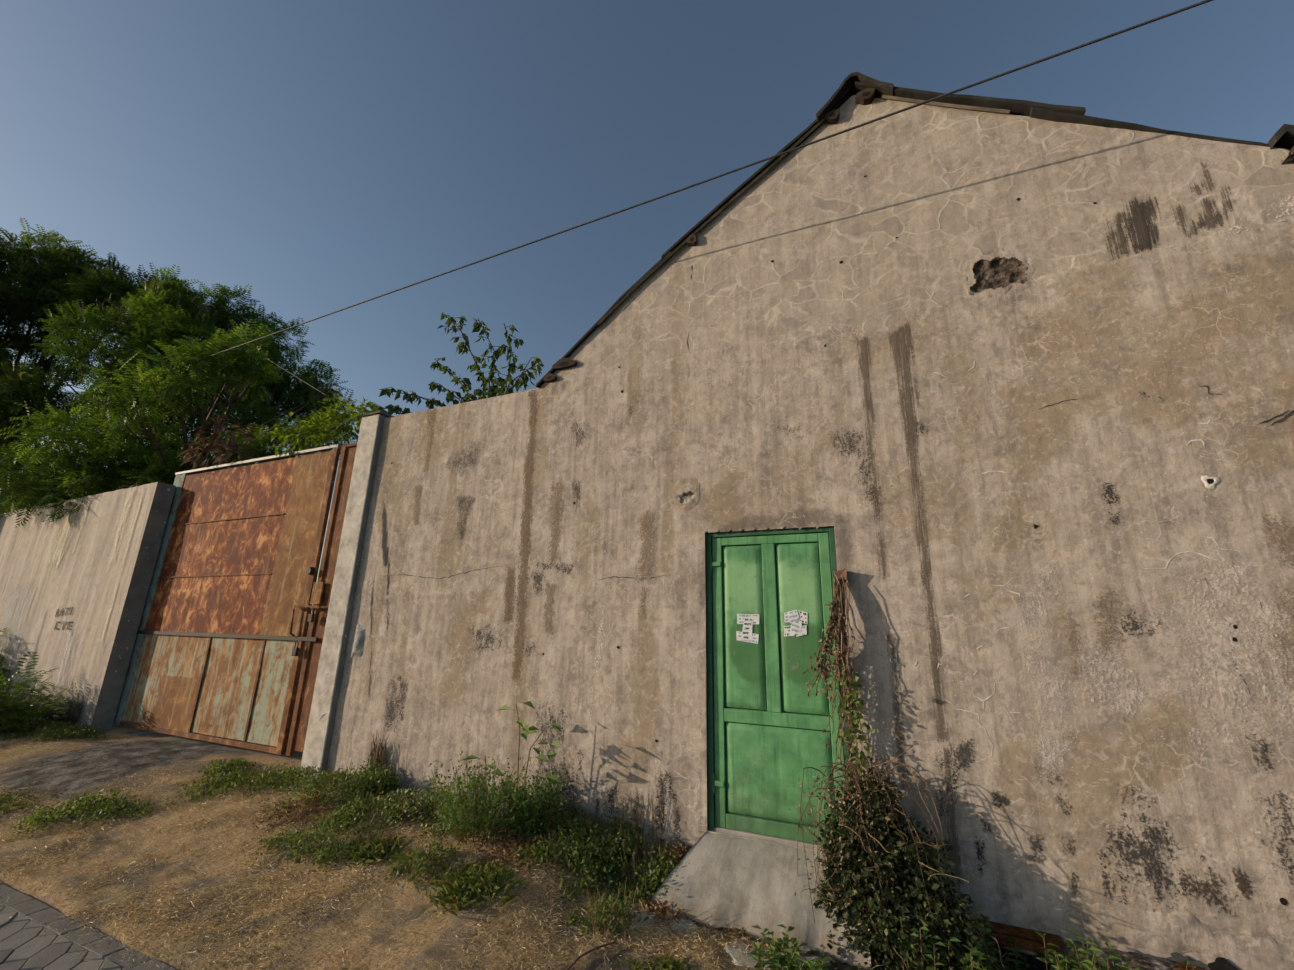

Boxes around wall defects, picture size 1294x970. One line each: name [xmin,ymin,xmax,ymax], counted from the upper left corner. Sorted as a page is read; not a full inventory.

flaking render [963,247,1035,301]
leakage [1106,197,1158,260]
leakage [1173,163,1294,238]
leakage [833,337,886,578]
leakage [470,390,581,680]
leakage [886,324,975,889]
leakage [975,792,1010,875]
mould [1100,786,1255,916]